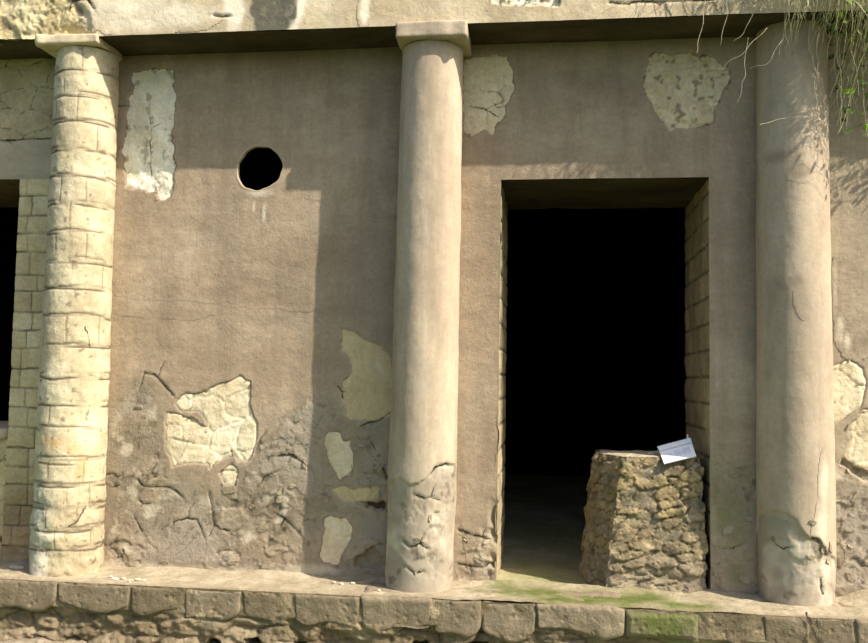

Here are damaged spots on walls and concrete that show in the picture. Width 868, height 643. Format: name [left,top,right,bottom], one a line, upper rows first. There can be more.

spalling [0,0,96,45]
crack [610,0,707,8]
peeling [122,69,176,200]
peeling [462,55,515,138]
peeling [641,53,731,131]
spalling [105,329,494,599]
spalling [710,359,868,607]